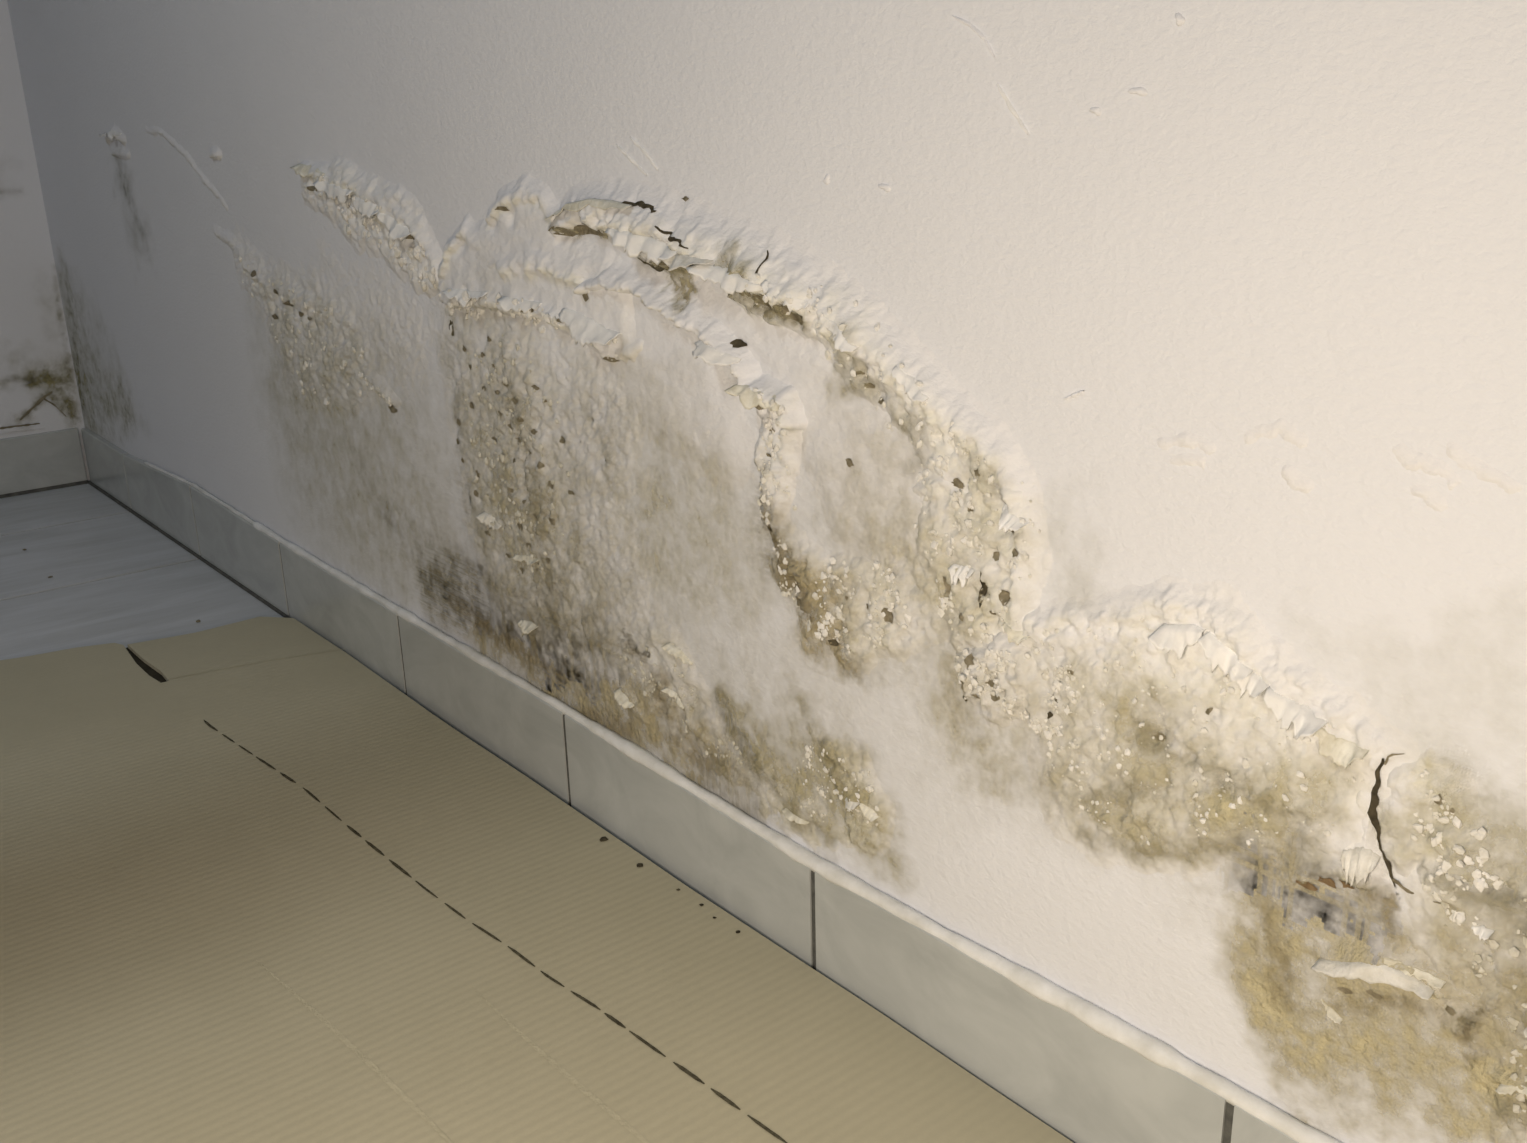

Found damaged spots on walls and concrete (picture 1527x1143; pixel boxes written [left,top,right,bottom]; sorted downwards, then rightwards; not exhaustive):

water stain [655,265,697,310]
water stain [721,260,805,328]
water stain [25,356,88,417]
water stain [480,451,557,587]
peeling [212,155,1527,1143]
water stain [719,697,869,832]
crack [1367,754,1441,904]
water stain [1185,773,1527,1143]